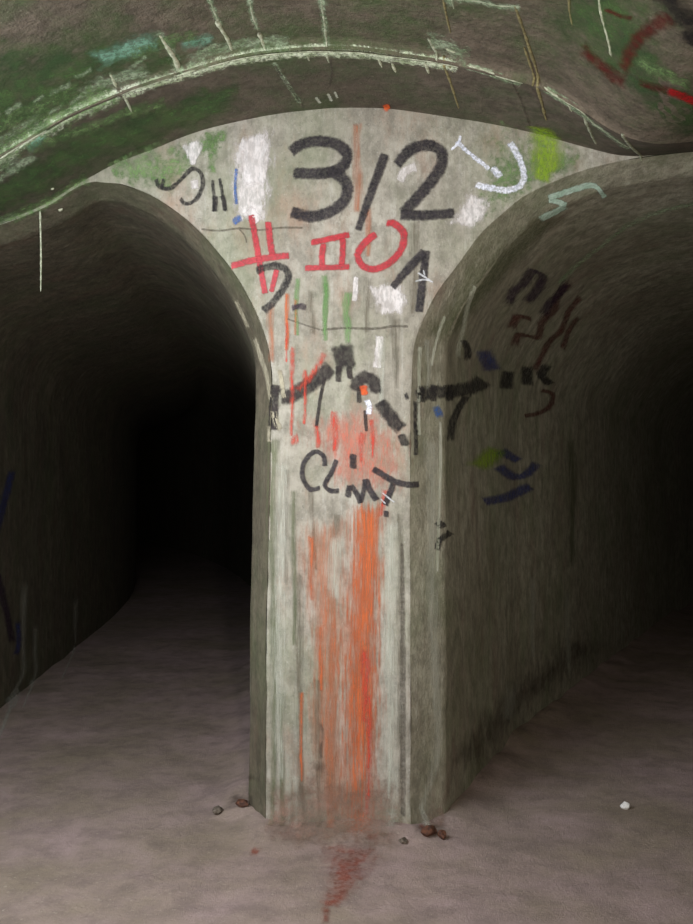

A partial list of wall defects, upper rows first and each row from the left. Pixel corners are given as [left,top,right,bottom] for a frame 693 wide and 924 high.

corrosion [304,507,384,838]